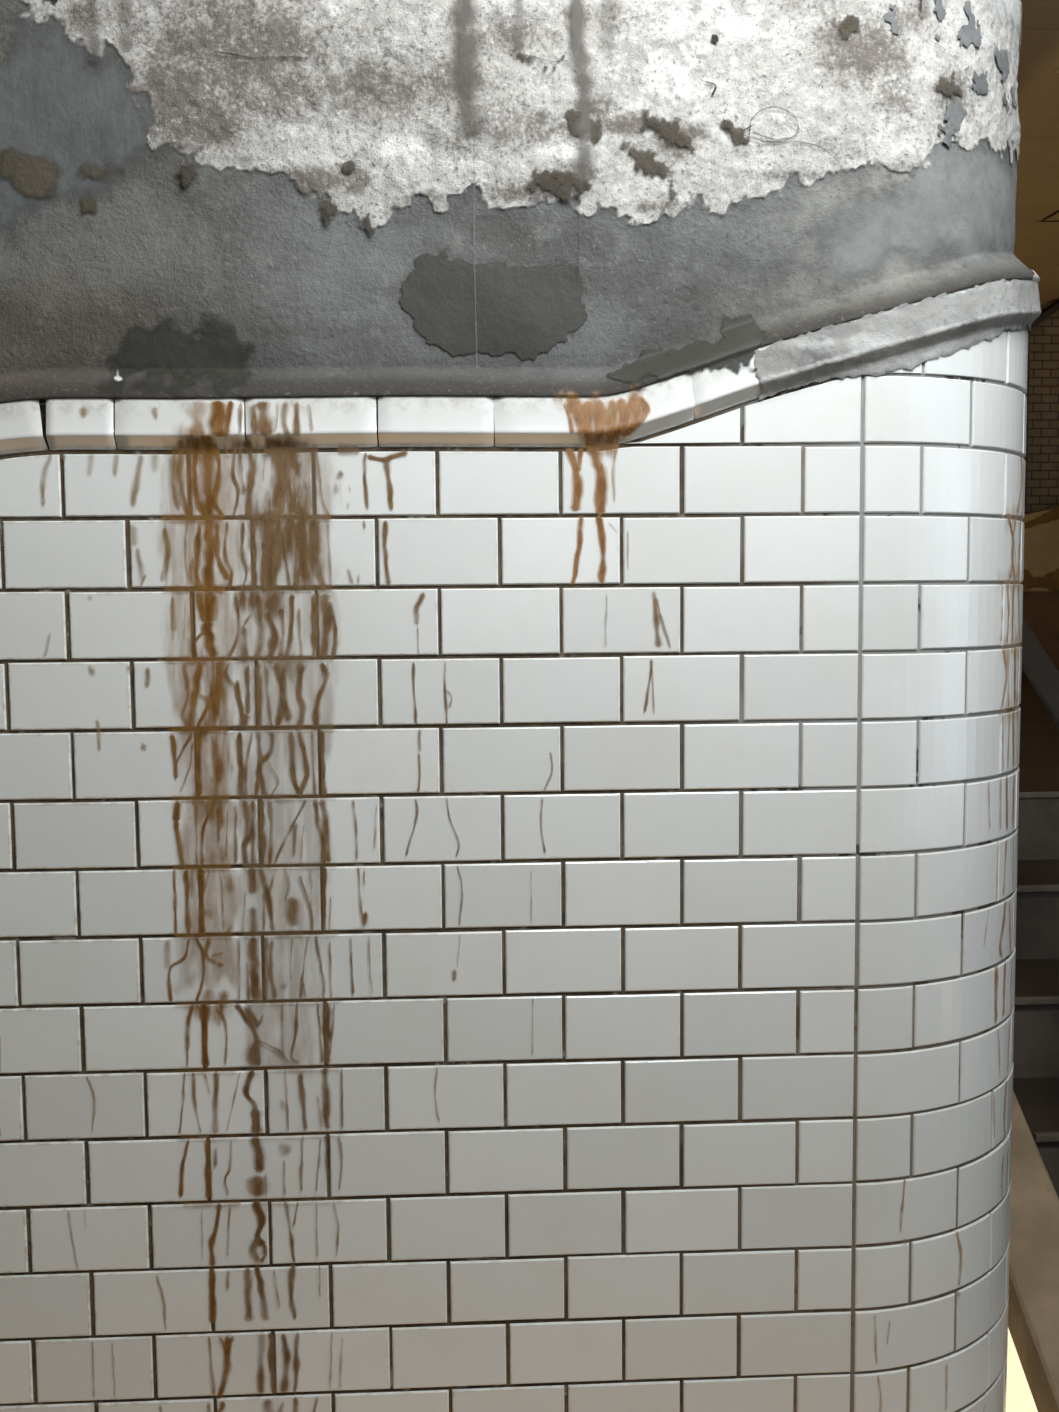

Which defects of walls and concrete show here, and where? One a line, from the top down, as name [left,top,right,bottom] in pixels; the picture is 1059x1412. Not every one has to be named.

leakage [454,0,482,134]
spalling [22,0,1022,235]
leakage [570,0,593,179]
leakage [399,250,588,360]
rust [132,457,142,504]
rust [339,447,407,584]
rust [565,392,650,584]
rust [162,400,343,1412]
rust [352,801,368,925]
rust [350,939,371,994]